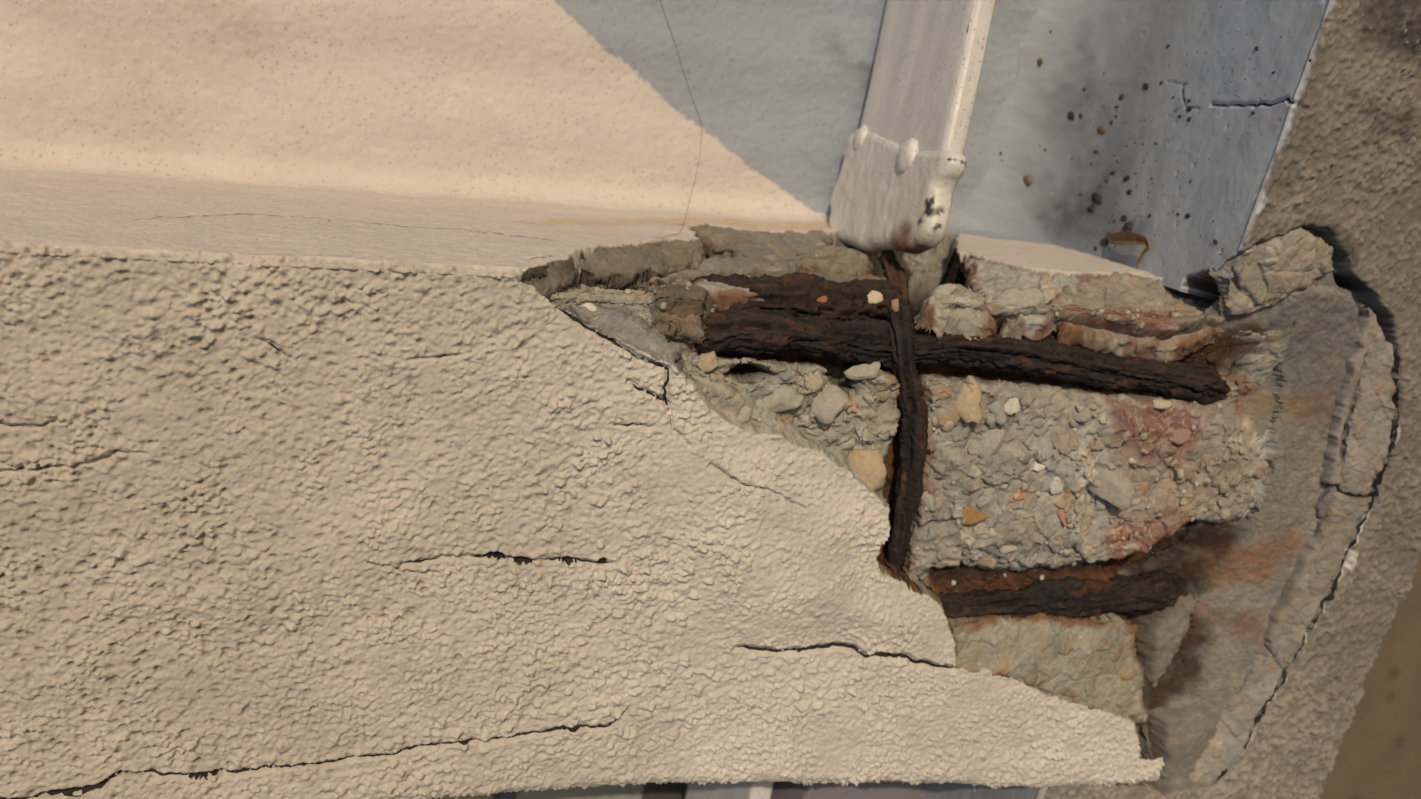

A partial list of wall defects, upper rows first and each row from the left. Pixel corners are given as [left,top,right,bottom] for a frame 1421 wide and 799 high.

crack [1175,82,1297,111]
spalling [518,224,1399,794]
crack [365,551,614,573]
corrosion [1119,521,1237,597]
crack [1211,350,1400,786]
crack [739,642,953,668]
corrosion [1142,616,1206,710]
crack [0,707,629,799]